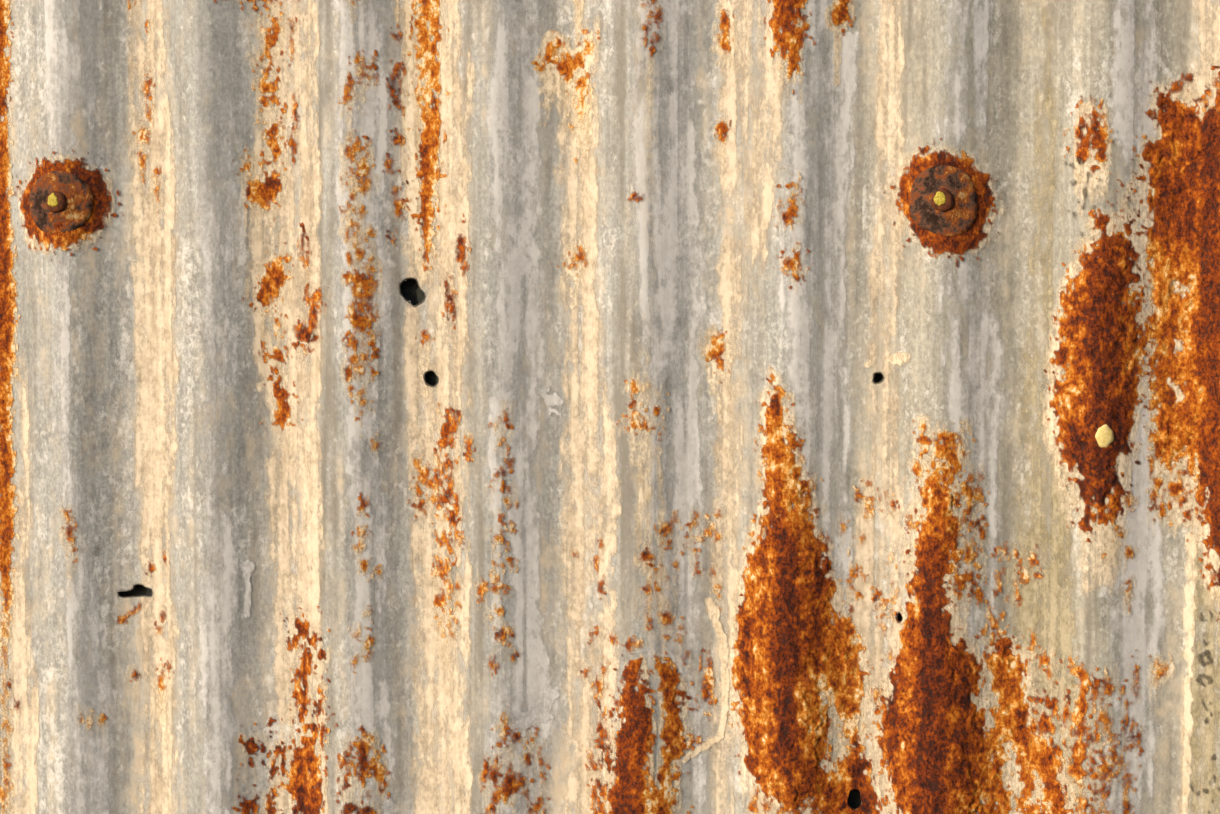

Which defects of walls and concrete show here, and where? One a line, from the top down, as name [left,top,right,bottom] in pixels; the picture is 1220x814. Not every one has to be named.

rust [0,0,124,814]
rust [214,0,312,449]
rust [231,605,391,814]
rust [338,0,471,451]
rust [407,330,476,643]
rust [477,405,519,676]
rust [479,706,550,814]
rust [530,0,600,170]
rust [764,0,855,103]
rust [580,368,1175,814]
rust [883,138,1003,267]
rust [1044,66,1220,622]